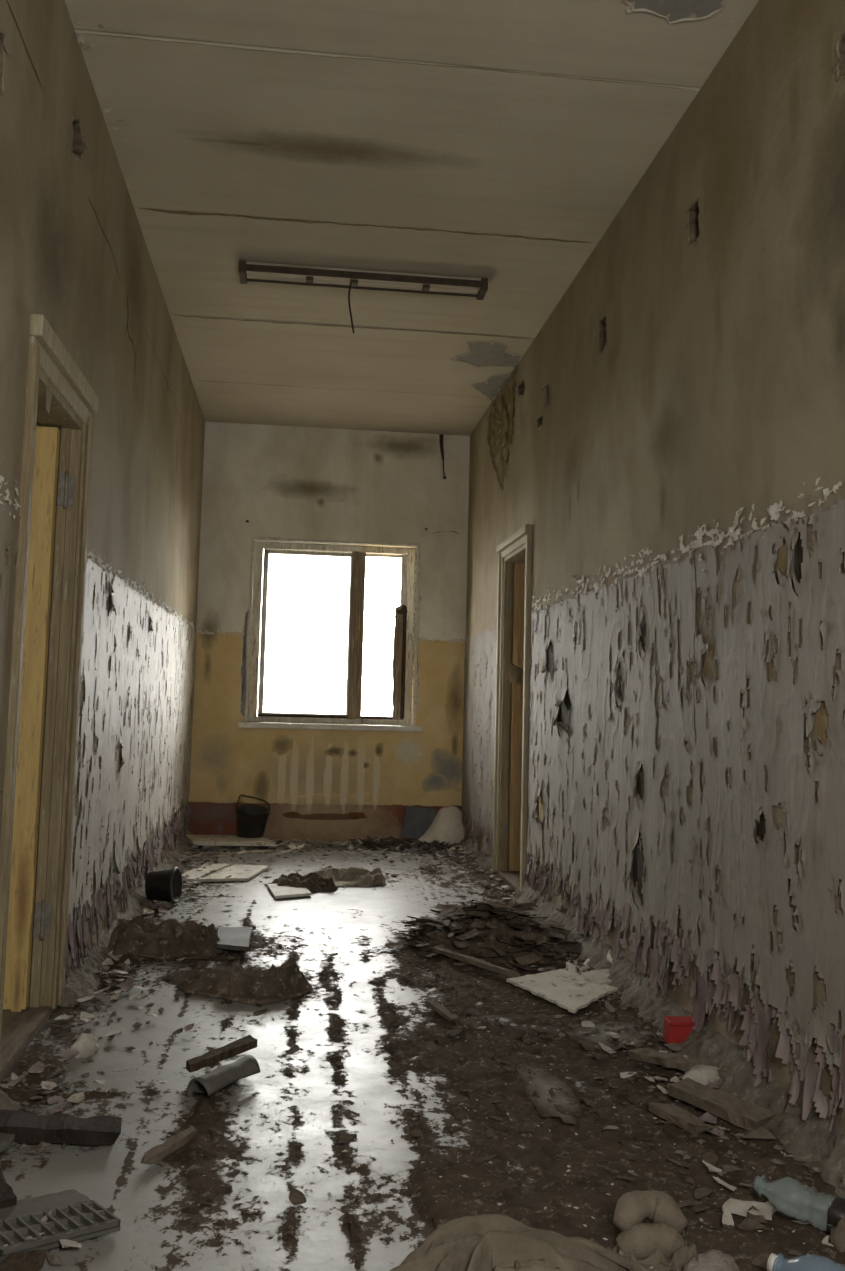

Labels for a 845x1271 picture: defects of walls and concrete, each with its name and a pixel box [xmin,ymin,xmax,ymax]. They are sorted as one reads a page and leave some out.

peeling [620,0,727,24]
water stain [145,123,522,176]
spalling [449,341,525,494]
peeling [0,475,21,843]
peeling [64,549,497,991]
water stain [189,729,412,841]
peeling [523,477,845,1143]
peeling [338,1134,357,1143]
peeling [289,1188,306,1206]
peeling [752,1253,770,1271]